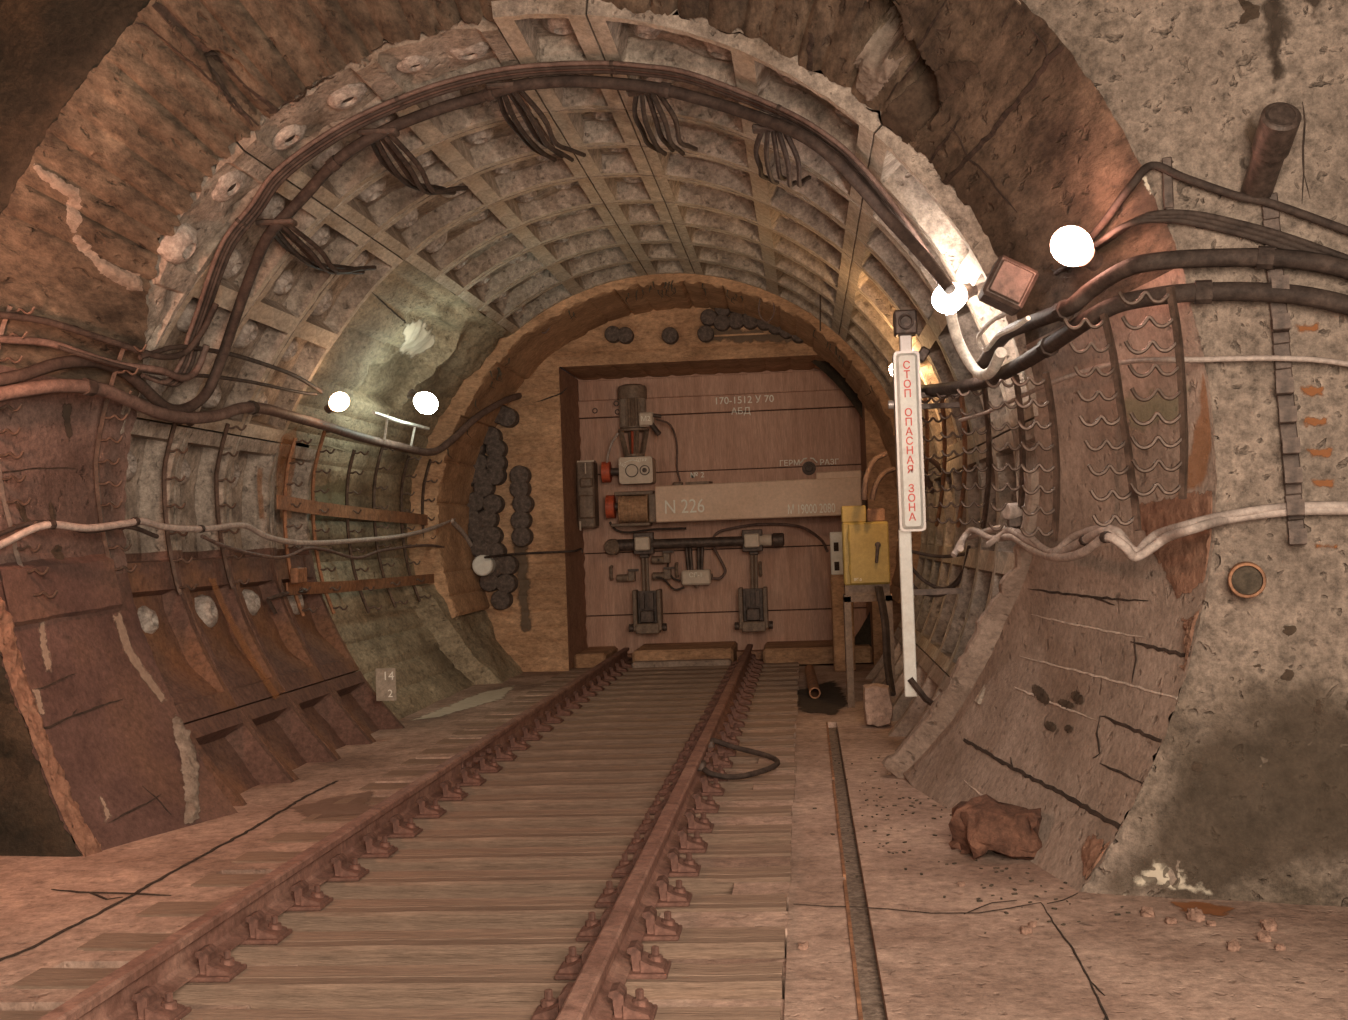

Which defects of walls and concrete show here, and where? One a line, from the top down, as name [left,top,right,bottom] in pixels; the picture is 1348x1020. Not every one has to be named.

spalling [853,0,979,145]
crack [1030,589,1148,605]
crack [1130,636,1192,683]
crack [43,698,124,729]
crack [963,738,1123,829]
crack [1093,715,1162,786]
spalling [1081,834,1110,880]
crack [793,876,1109,1020]